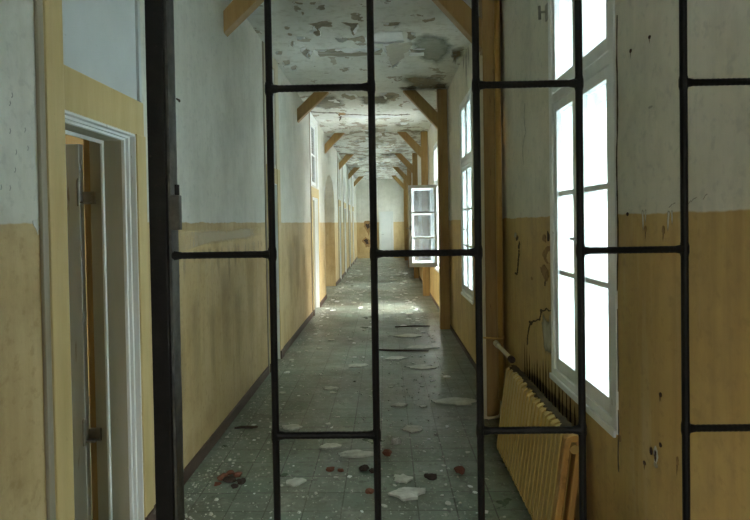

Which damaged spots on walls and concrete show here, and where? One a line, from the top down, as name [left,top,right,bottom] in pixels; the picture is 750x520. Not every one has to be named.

peeling [284,21,425,68]
leakage [415,36,464,64]
peeling [354,127,402,172]
crack [527,308,551,345]